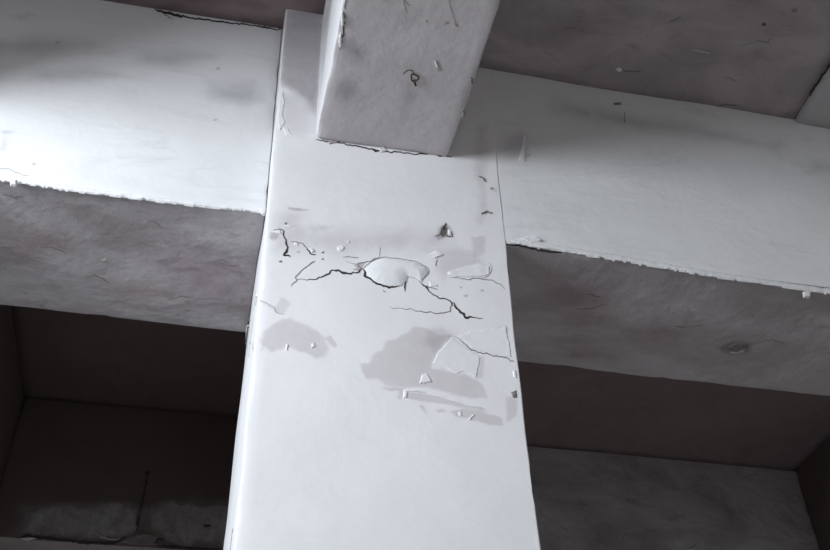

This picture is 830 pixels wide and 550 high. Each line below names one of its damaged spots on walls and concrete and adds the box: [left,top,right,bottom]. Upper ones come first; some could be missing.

crack [155,9,280,30]
crack [810,64,830,96]
crack [273,223,504,319]
spalling [19,534,223,550]